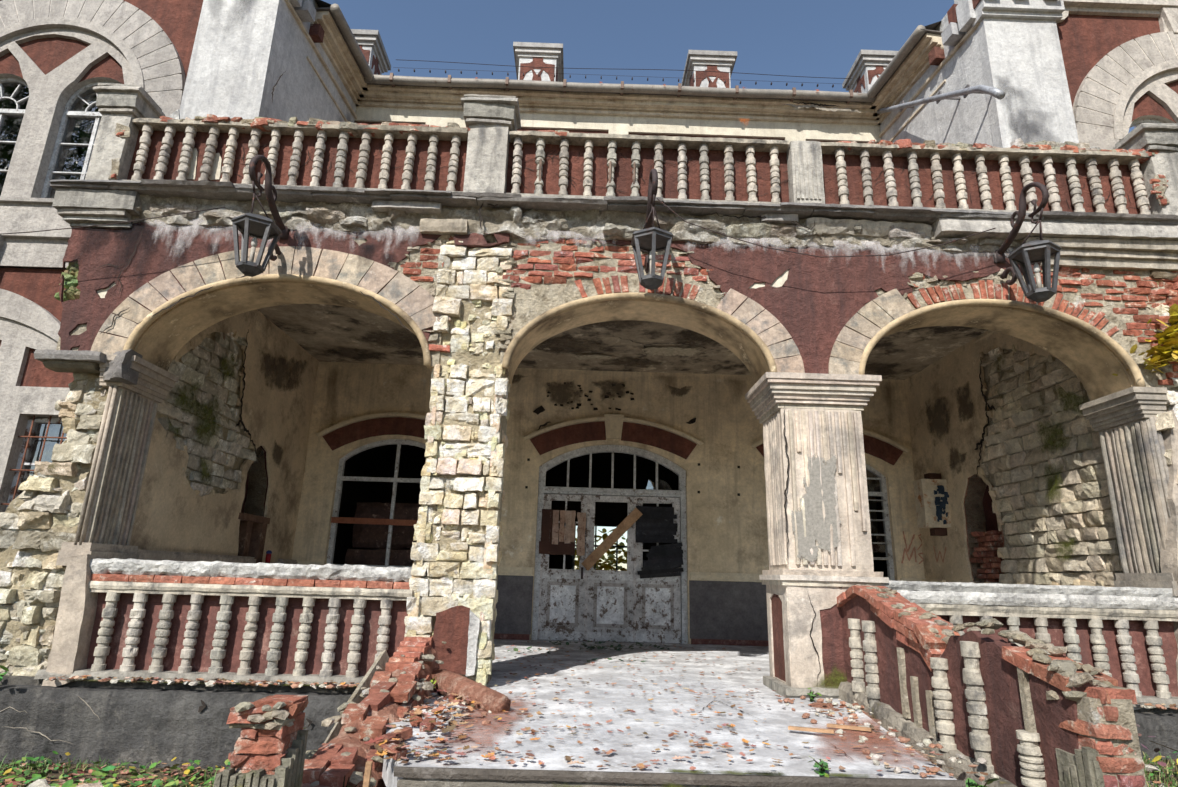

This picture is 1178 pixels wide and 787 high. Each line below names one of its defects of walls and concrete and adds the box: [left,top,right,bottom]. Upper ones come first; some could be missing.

crack [236,329,265,457]
peeling [329,330,450,359]
spalling [387,233,727,353]
peeling [535,331,721,368]
crack [782,405,790,560]
peeling [791,454,842,562]
peeling [865,363,894,373]
crack [974,359,996,477]
spalling [902,266,1178,385]
spalling [964,344,1123,586]
spalling [1155,411,1175,431]